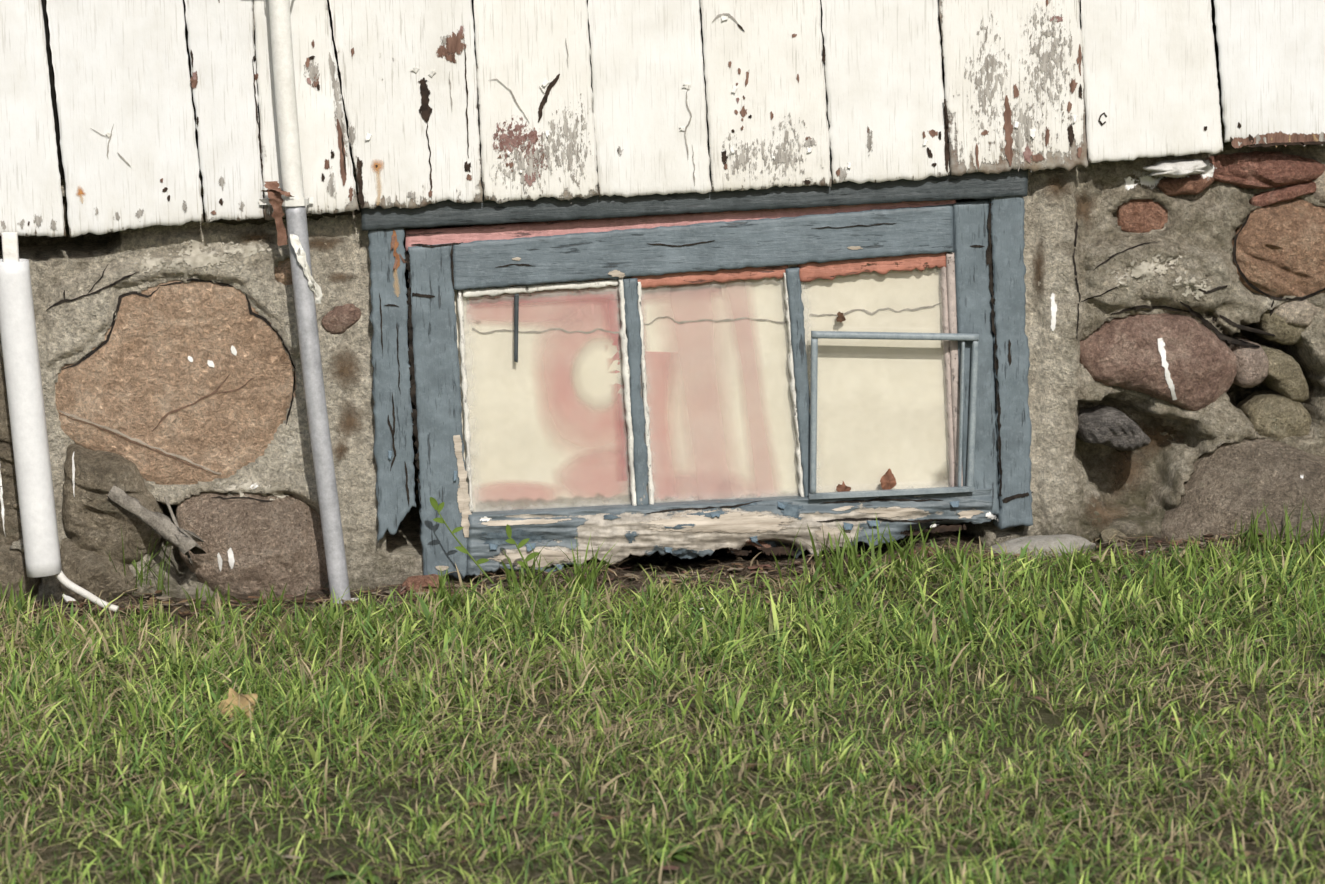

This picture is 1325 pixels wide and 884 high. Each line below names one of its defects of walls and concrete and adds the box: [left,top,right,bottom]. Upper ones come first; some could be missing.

peeling [436,26,472,181]
peeling [489,93,591,197]
peeling [721,61,817,184]
peeling [964,0,1082,174]
peeling [379,294,401,395]
peeling [388,415,410,504]
peeling [603,498,999,559]